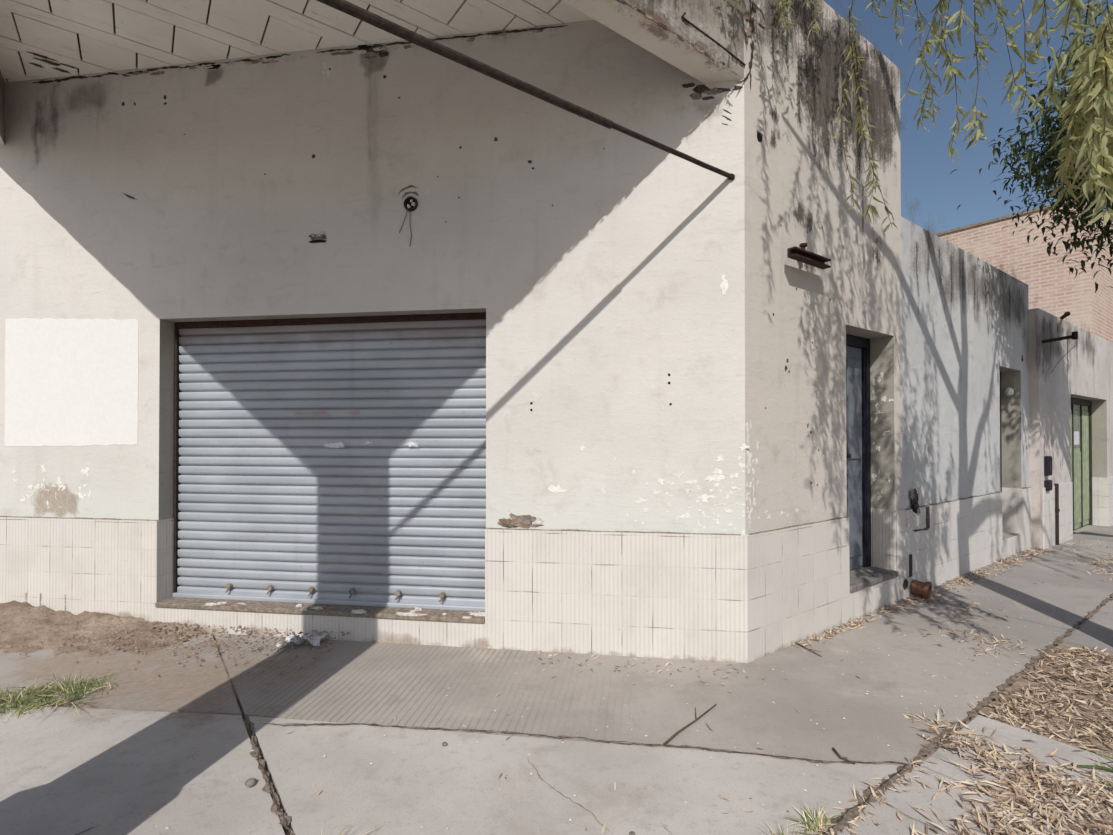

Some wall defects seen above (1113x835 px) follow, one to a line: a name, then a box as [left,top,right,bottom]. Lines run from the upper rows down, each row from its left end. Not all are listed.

spalling [617,0,746,100]
water stain [689,15,742,62]
water stain [754,0,907,268]
water stain [916,225,1094,373]
peeling [871,372,894,451]
peeling [626,423,799,534]